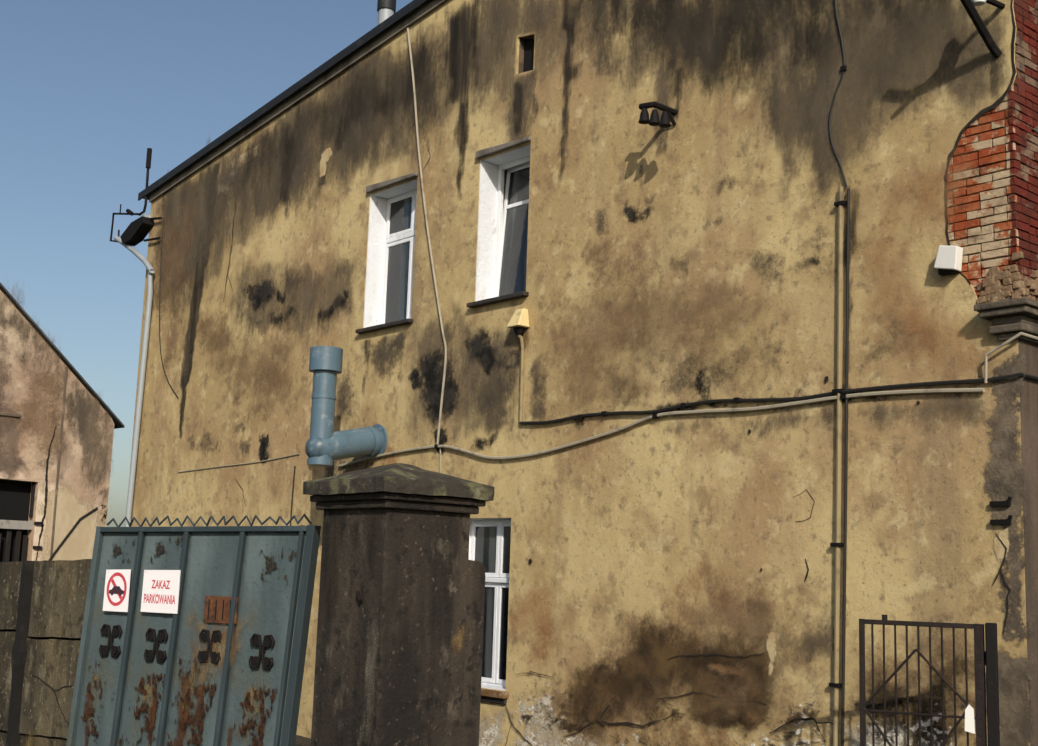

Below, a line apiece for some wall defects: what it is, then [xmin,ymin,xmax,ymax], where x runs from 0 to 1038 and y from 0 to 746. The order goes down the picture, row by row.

water stain [446,2,489,188]
flaking render [944,0,1038,304]
water stain [164,210,289,450]
water stain [237,264,353,333]
water stain [408,311,520,450]
crack [35,426,57,561]
crack [993,533,1011,635]
crack [505,703,532,746]
water stain [479,592,834,746]
crack [564,691,833,744]
crack [668,651,767,660]
water stain [846,643,975,746]